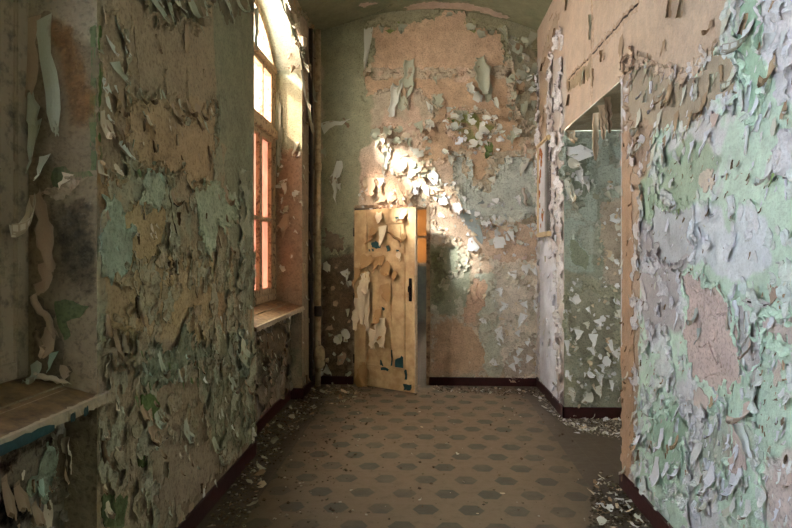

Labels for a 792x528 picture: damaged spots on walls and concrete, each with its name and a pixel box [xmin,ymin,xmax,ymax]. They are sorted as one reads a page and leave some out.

peeling [143,0,259,55]
crack [560,0,639,128]
flaking render [9,6,221,385]
flaking render [275,0,792,528]
peeling [224,321,288,388]
spalling [101,429,124,519]
spalling [137,345,257,524]